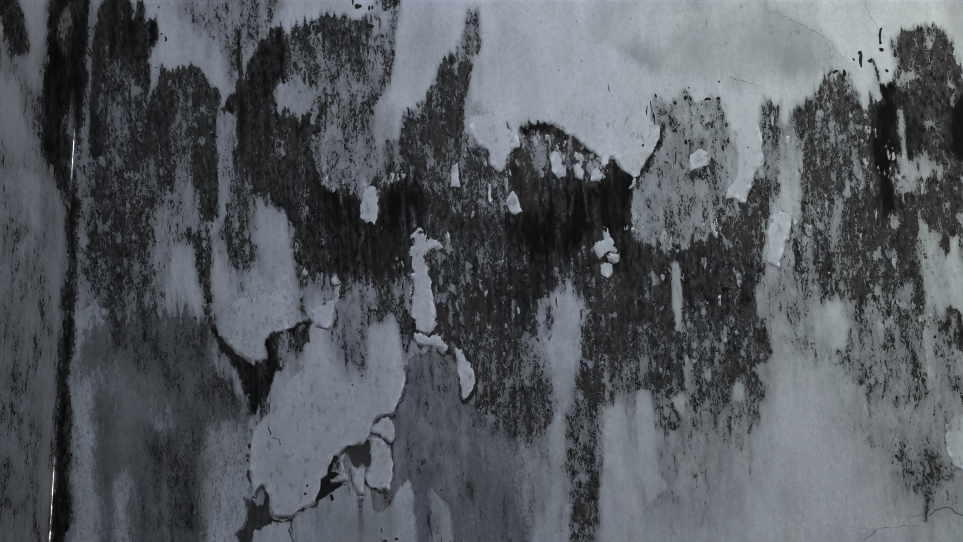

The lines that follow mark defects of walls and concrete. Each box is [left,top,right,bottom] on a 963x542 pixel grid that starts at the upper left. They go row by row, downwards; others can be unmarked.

peeling [852,28,897,68]
peeling [318,162,406,225]
peeling [447,82,660,231]
peeling [722,111,797,204]
leakage [0,217,29,254]
peeling [593,228,620,278]
peeling [767,194,843,268]
leakage [0,266,53,542]
leakage [137,402,202,542]
leakage [382,406,444,476]
leakage [414,465,545,542]
crack [857,507,963,542]